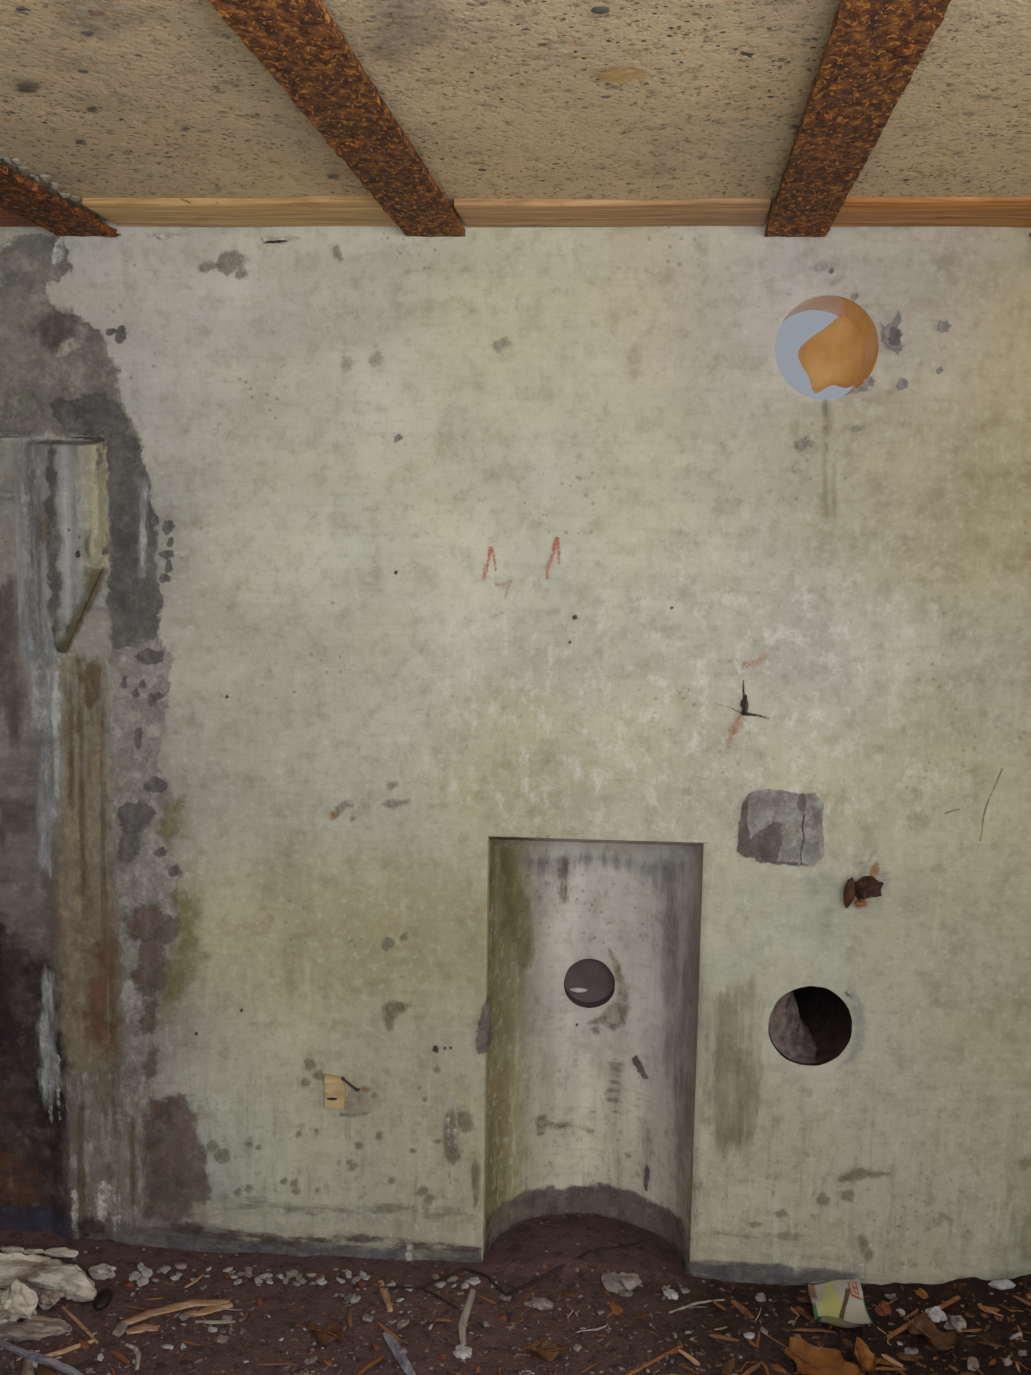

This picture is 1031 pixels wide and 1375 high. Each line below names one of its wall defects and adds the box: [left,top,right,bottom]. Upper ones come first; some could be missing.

crack [722,680,769,719]
damp [0,429,884,1286]
peeling [737,789,824,866]
corrosion [843,863,887,908]